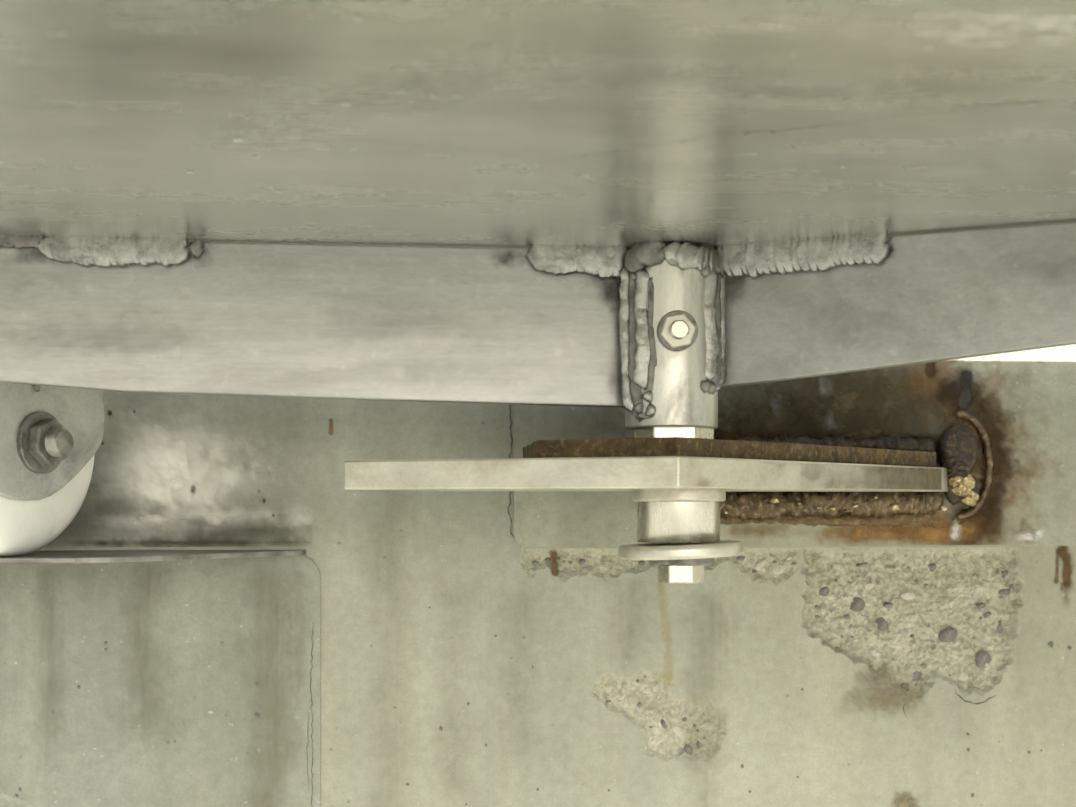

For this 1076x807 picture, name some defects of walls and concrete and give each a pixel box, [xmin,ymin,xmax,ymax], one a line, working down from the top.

corrosion [714,362,1016,545]
spalling [517,548,659,583]
spalling [704,527,1041,700]
corrosion [1055,546,1072,587]
spalling [586,668,727,763]